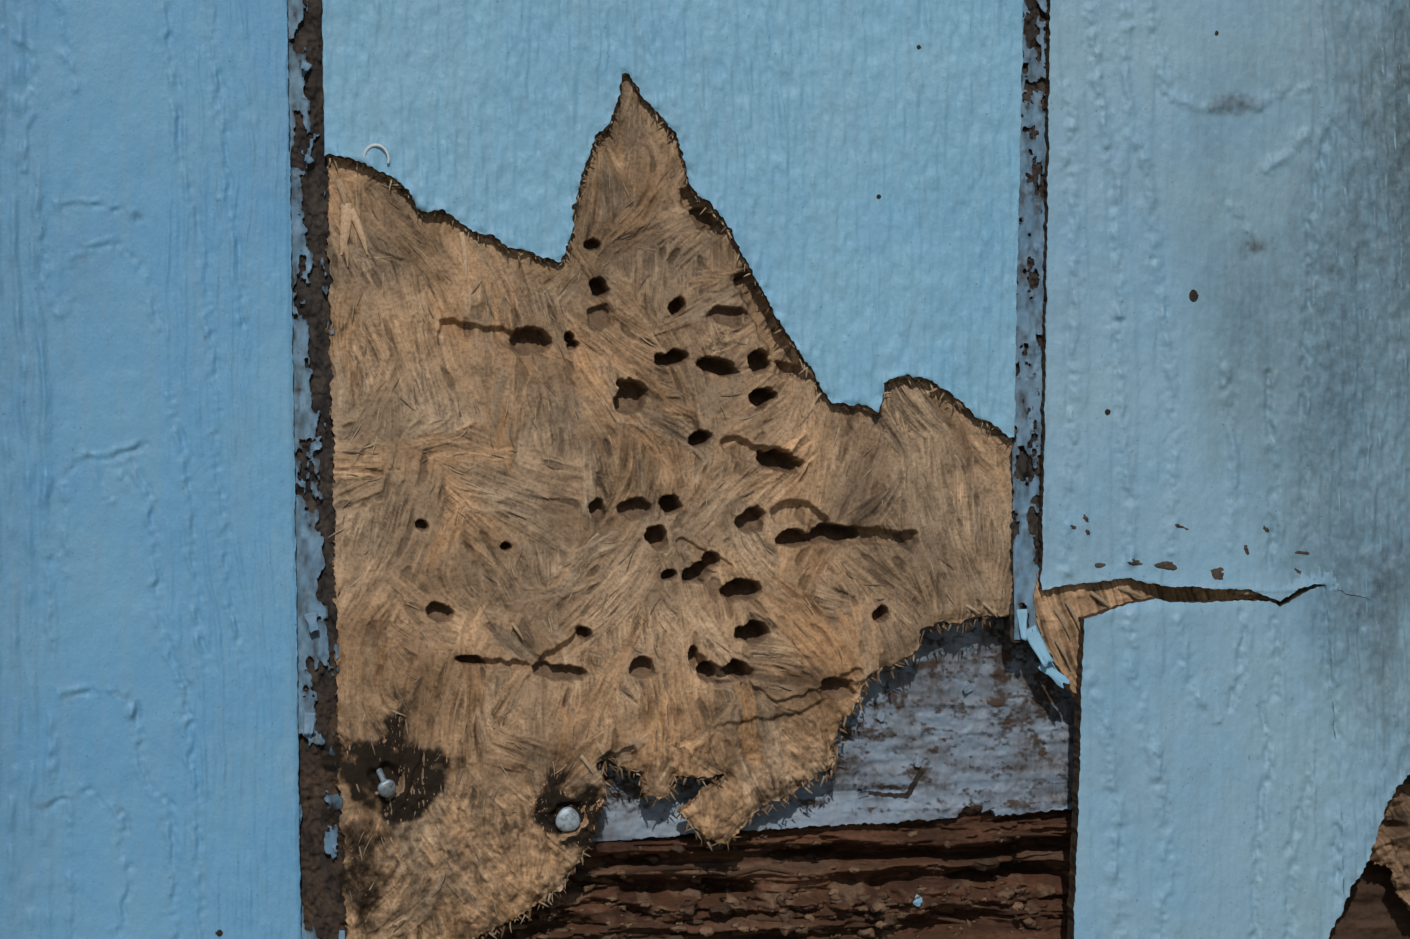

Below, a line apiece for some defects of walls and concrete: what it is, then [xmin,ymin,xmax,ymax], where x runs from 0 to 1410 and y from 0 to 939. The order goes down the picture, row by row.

peeling [287,0,1074,939]
crack [1033,574,1369,697]
spalling [1329,775,1410,939]